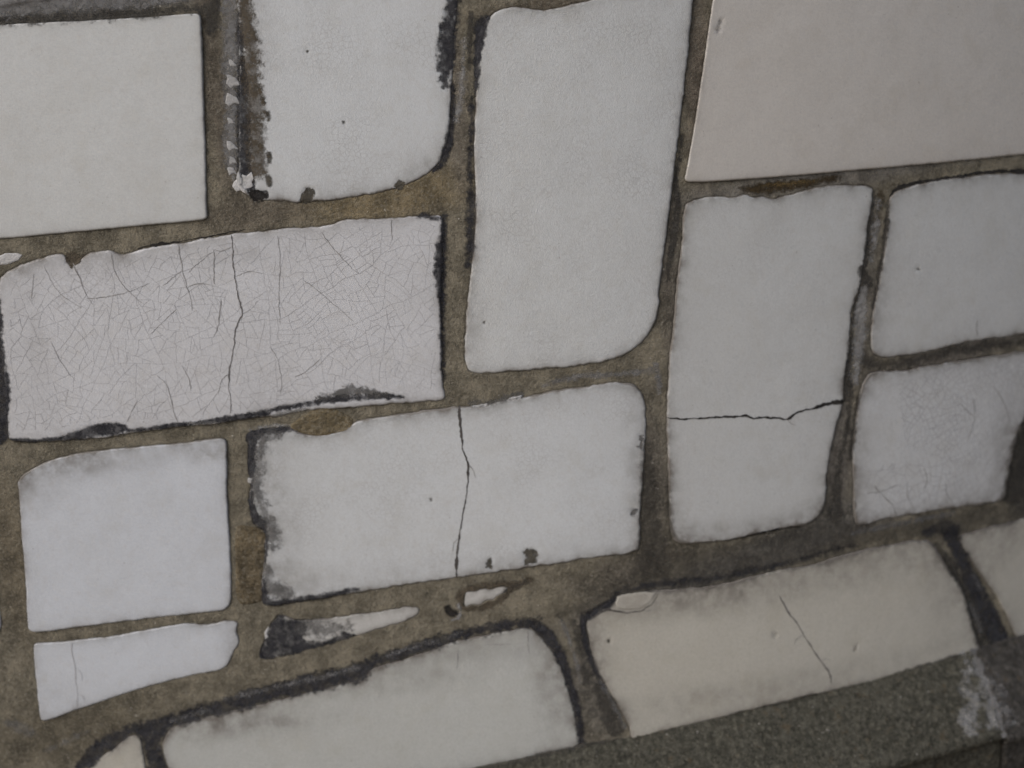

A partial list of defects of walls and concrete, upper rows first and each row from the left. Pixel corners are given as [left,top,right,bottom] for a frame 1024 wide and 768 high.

spalling [221,0,272,203]
rust [742,175,841,195]
crack [10,219,436,430]
spalling [0,302,404,660]
crack [452,405,475,577]
crack [667,399,845,425]
crack [780,597,832,683]